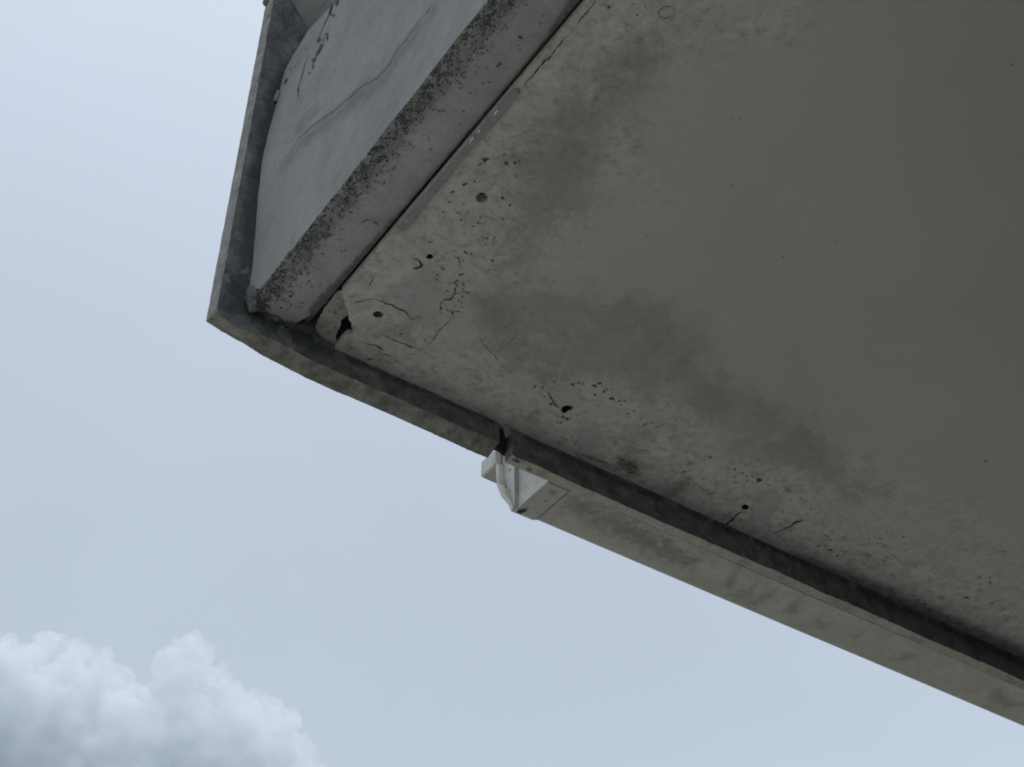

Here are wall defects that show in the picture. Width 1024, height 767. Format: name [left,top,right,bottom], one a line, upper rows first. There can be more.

damp [221,0,515,356]
crack [357,279,467,350]